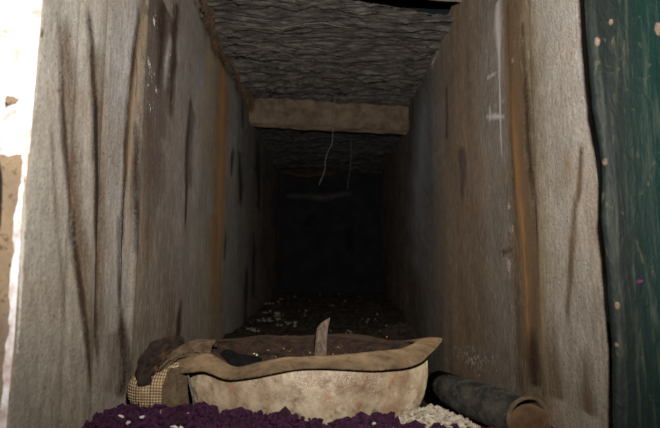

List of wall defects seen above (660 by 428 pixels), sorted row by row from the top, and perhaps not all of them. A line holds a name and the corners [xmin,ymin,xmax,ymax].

leakage [61,15,102,377]
leakage [133,0,178,230]
corrosion [505,3,538,386]
leakage [567,150,582,307]
leakage [113,315,129,393]